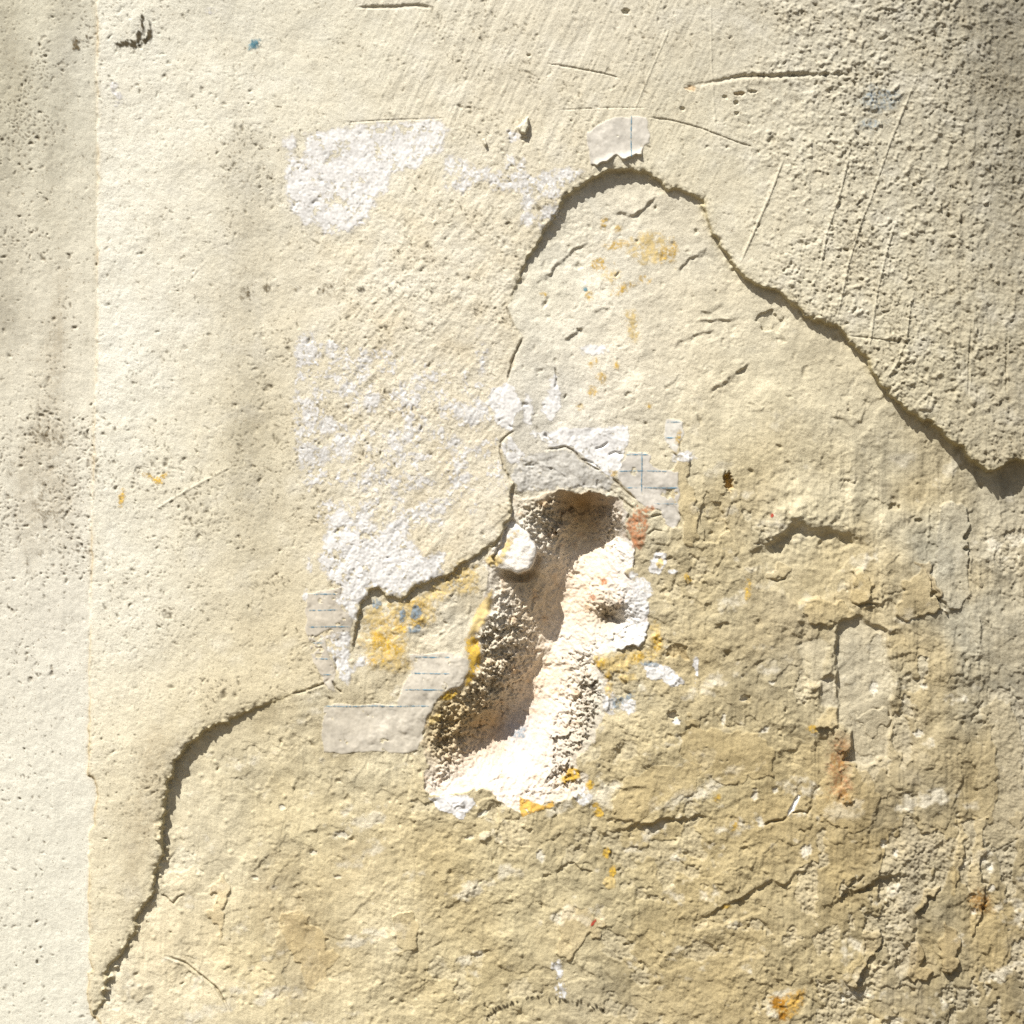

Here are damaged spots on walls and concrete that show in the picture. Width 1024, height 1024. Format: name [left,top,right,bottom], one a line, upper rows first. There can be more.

peeling [282,117,449,235]
crack [506,306,524,384]
crack [500,430,666,537]
spalling [93,155,1024,1024]
crack [290,657,343,696]
crack [161,893,185,906]
crack [164,955,233,1018]